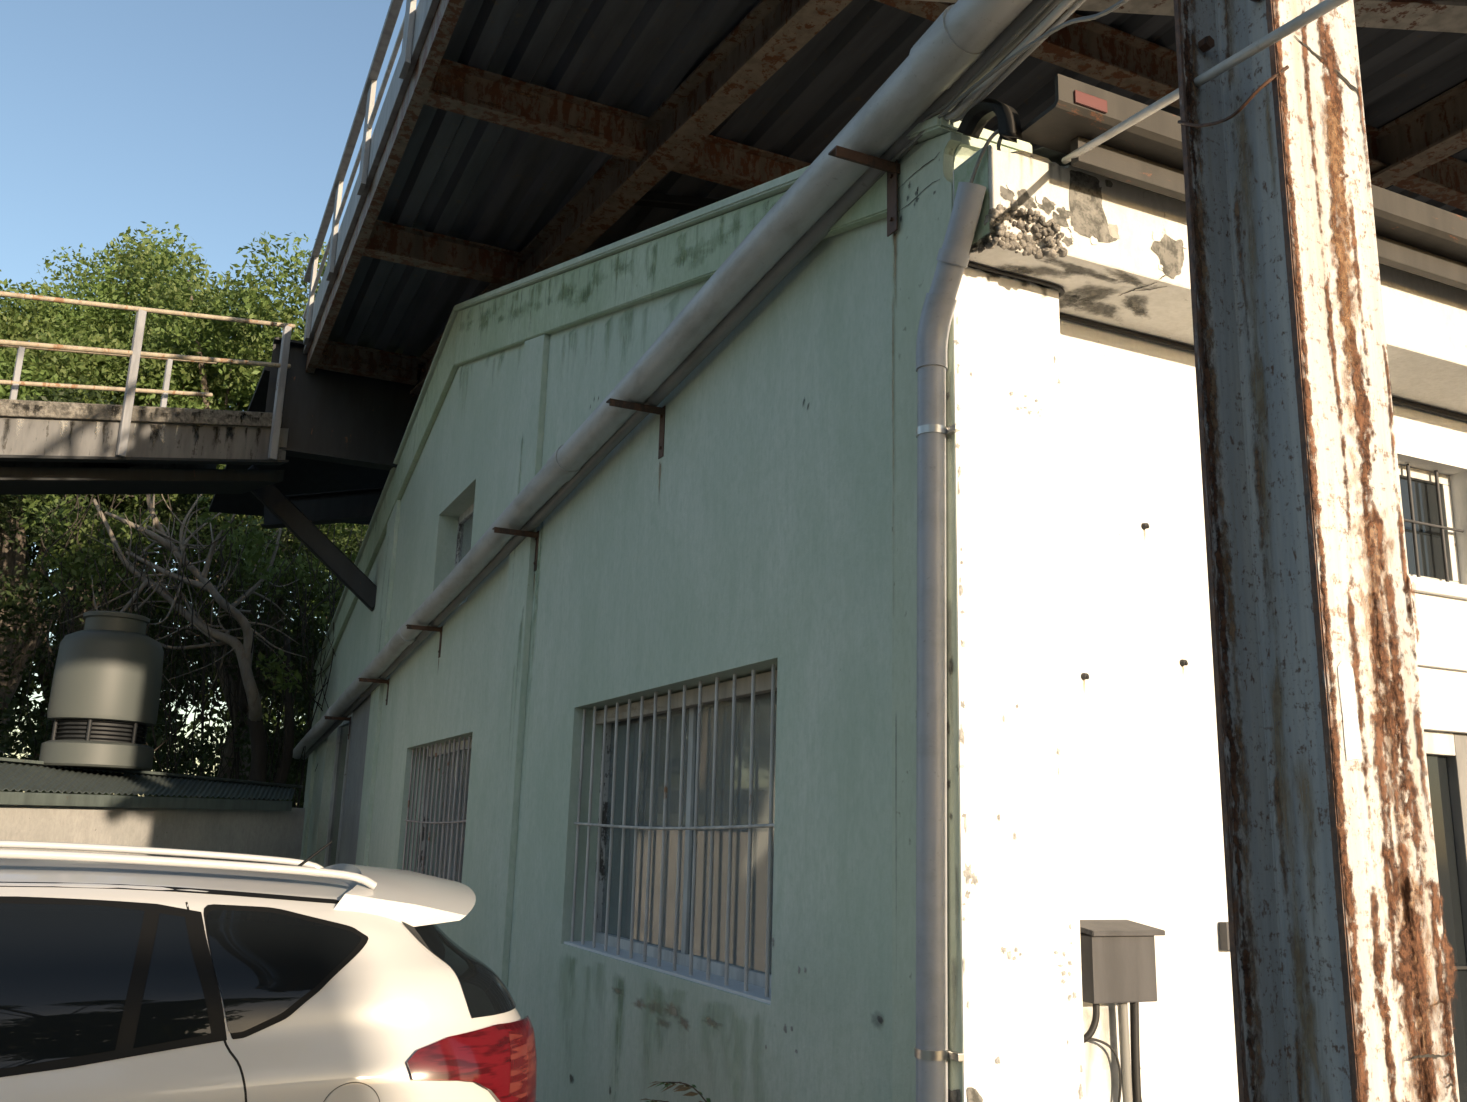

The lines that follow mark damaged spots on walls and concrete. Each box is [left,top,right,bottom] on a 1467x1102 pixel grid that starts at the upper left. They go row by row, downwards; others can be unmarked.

spalling [969,170,1123,259]
peeling [1151,234,1188,279]
rust [1266,0,1458,1102]
peeling [948,1087,983,1102]